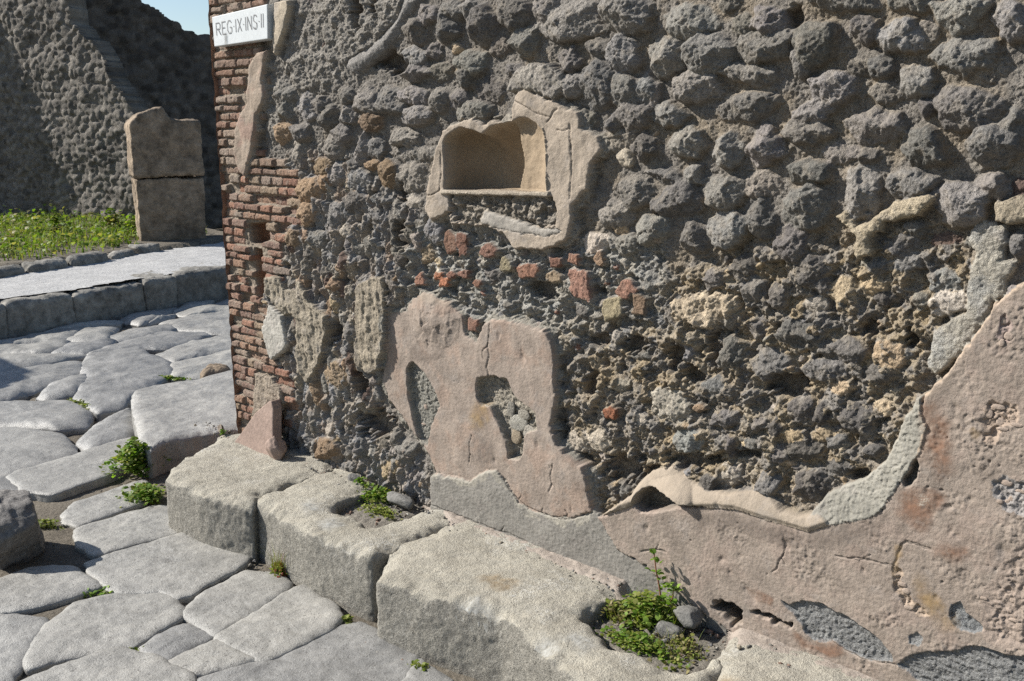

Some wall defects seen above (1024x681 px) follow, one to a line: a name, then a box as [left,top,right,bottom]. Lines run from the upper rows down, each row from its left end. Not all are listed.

spalling [408,362,440,444]
spalling [477,375,537,460]
crack [836,541,931,566]
spalling [756,539,1024,681]